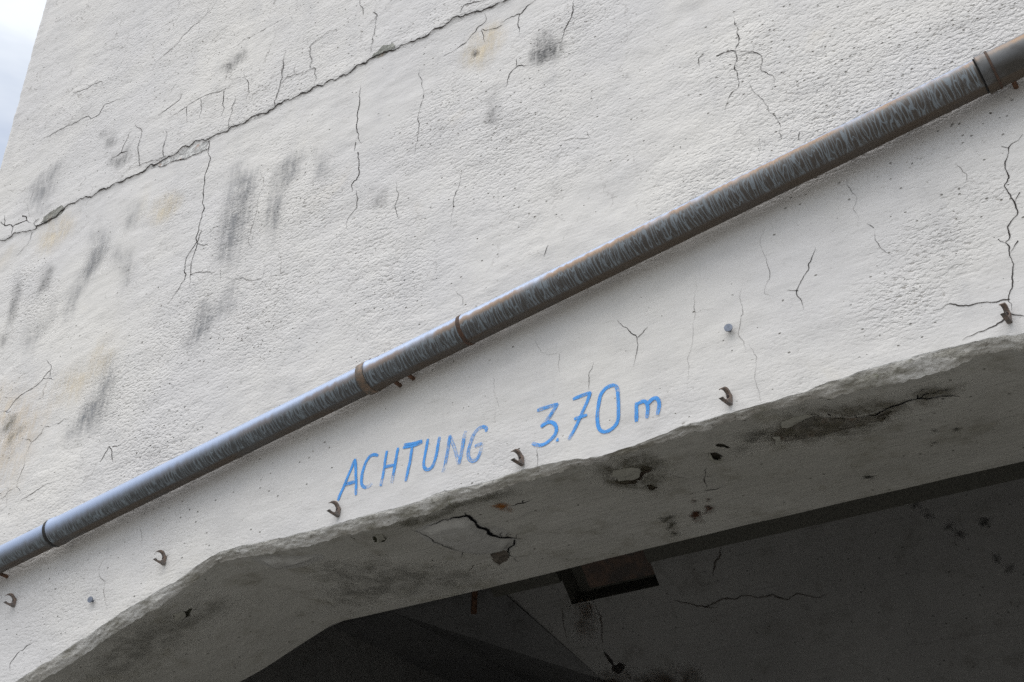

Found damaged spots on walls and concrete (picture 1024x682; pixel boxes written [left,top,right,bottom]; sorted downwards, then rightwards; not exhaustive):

crack [698,21,799,139]
crack [0,0,534,304]
crack [933,134,1023,339]
crack [767,251,815,309]
spalling [611,466,657,490]
crack [415,512,526,570]
crack [675,548,824,608]